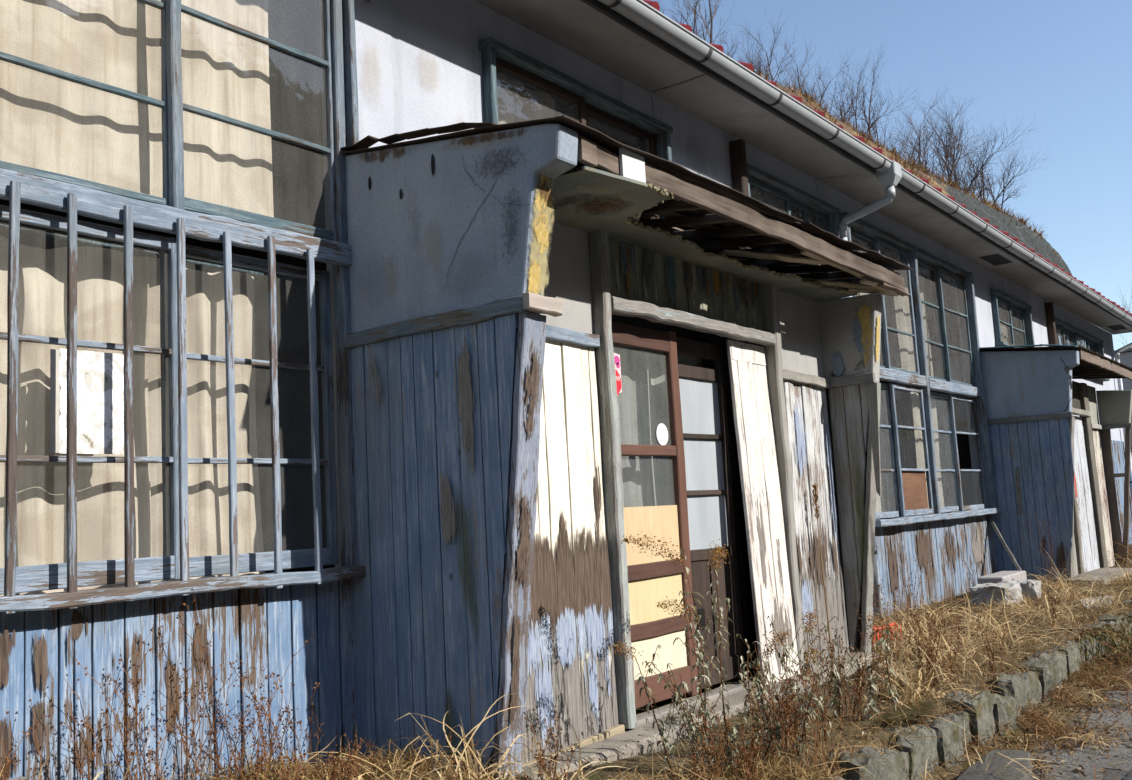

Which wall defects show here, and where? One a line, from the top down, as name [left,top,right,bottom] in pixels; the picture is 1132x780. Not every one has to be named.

crack [442,154,530,299]
peeling [525,350,538,440]
peeling [794,400,808,480]
peeling [756,415,850,673]
peeling [883,523,990,603]
peeling [0,625,16,688]
peeling [33,610,89,756]
peeling [165,641,180,736]
peeling [193,623,210,673]
peeling [510,453,618,764]
peeling [0,717,17,780]
peeling [102,759,117,780]